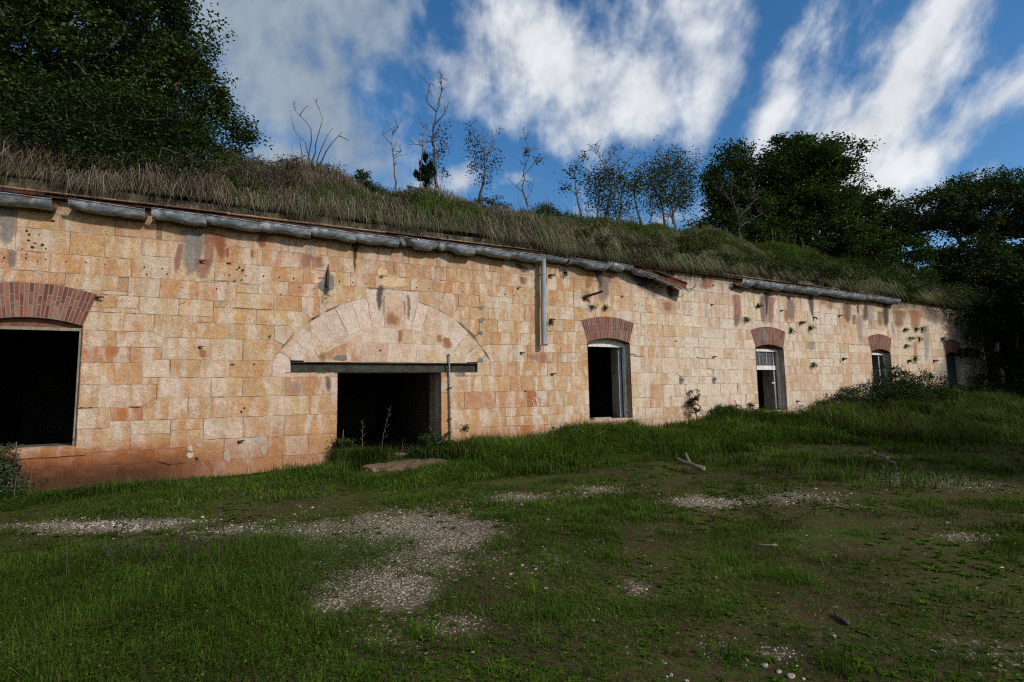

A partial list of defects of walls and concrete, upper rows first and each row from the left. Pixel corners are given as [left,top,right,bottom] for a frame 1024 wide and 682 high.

leakage [0,209,16,266]
leakage [175,230,216,278]
leakage [730,283,741,326]
leakage [761,292,774,341]